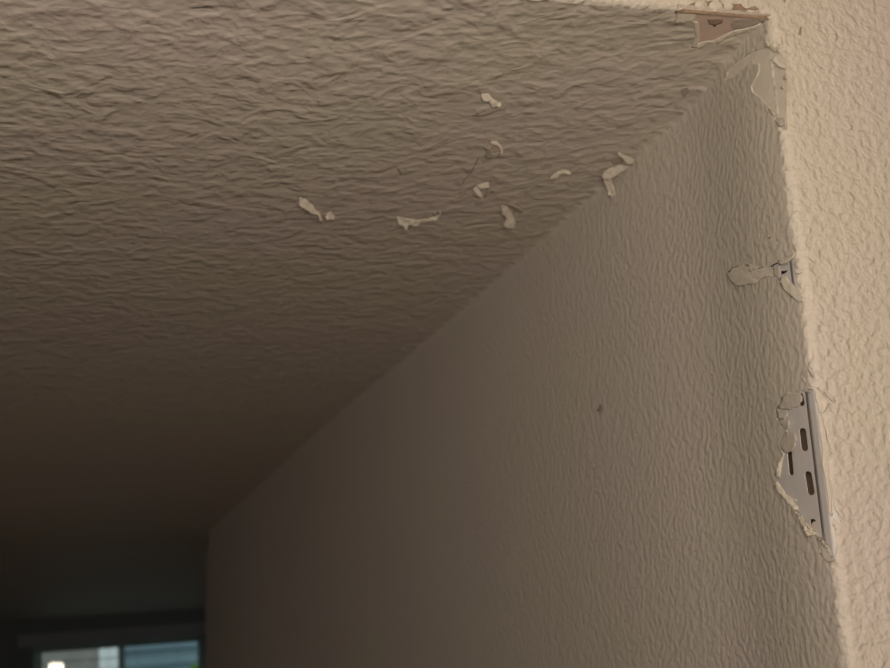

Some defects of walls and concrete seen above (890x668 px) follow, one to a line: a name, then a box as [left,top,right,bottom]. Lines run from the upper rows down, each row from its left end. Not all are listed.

flaking render [675,0,771,49]
peeling [726,41,789,129]
peeling [397,211,442,231]
peeling [473,182,490,205]
peeling [501,204,524,229]
peeling [602,153,634,199]
peeling [726,254,804,302]
peeling [775,387,846,562]